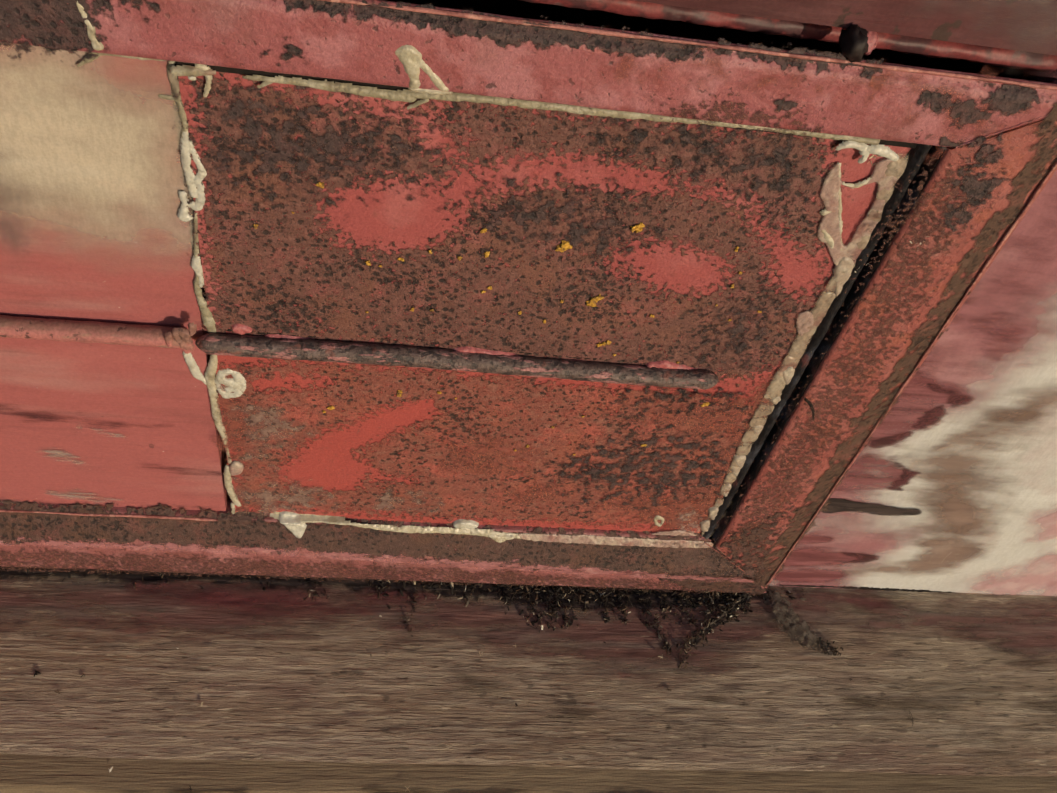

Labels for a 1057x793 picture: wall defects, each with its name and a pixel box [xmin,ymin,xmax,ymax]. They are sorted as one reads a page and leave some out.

rust [0,0,161,59]
rust [261,37,308,66]
rust [0,72,1040,597]
damp [775,384,1057,583]